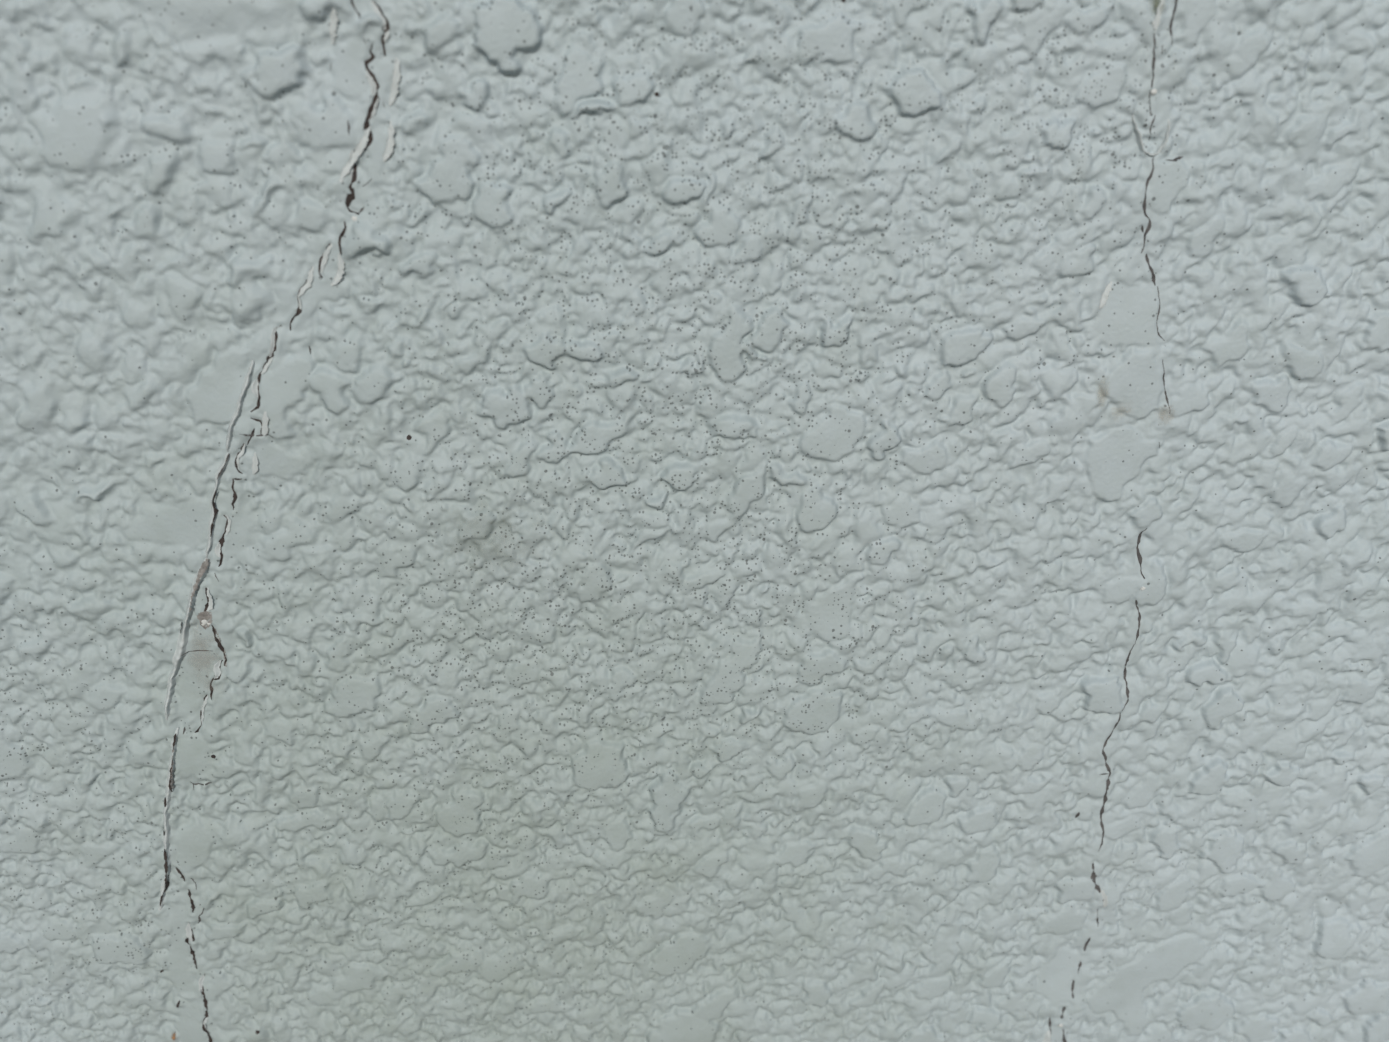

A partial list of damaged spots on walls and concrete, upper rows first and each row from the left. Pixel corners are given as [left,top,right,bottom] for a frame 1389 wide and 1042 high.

crack [180,0,401,734]
crack [1098,281,1112,309]
crack [1141,0,1183,448]
crack [160,867,212,1042]
crack [1048,528,1147,1042]